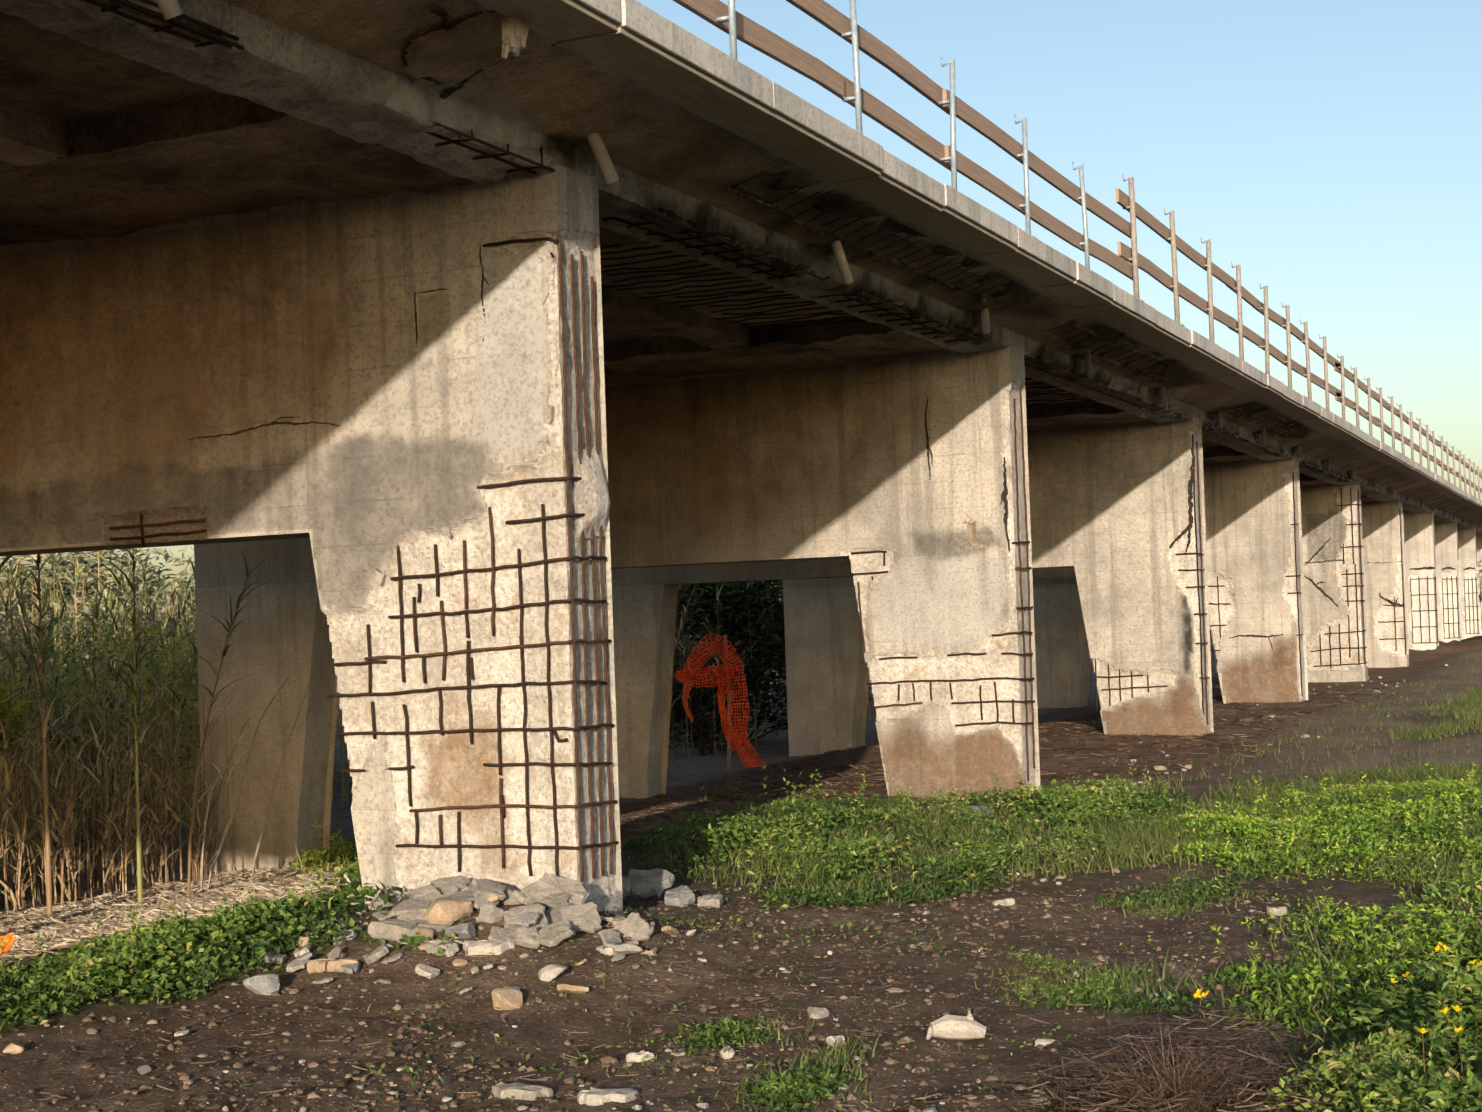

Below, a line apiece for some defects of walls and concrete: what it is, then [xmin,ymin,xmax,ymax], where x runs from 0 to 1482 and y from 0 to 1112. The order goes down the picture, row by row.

spalling [51,0,246,61]
crack [401,9,556,99]
crack [187,417,341,440]
crack [925,399,933,480]
leakage [317,441,478,588]
spalling [323,209,866,899]
spalling [839,360,1172,791]
spalling [1093,425,1239,733]
crack [1169,447,1195,553]
crack [1304,538,1344,607]
spalling [1282,463,1482,702]